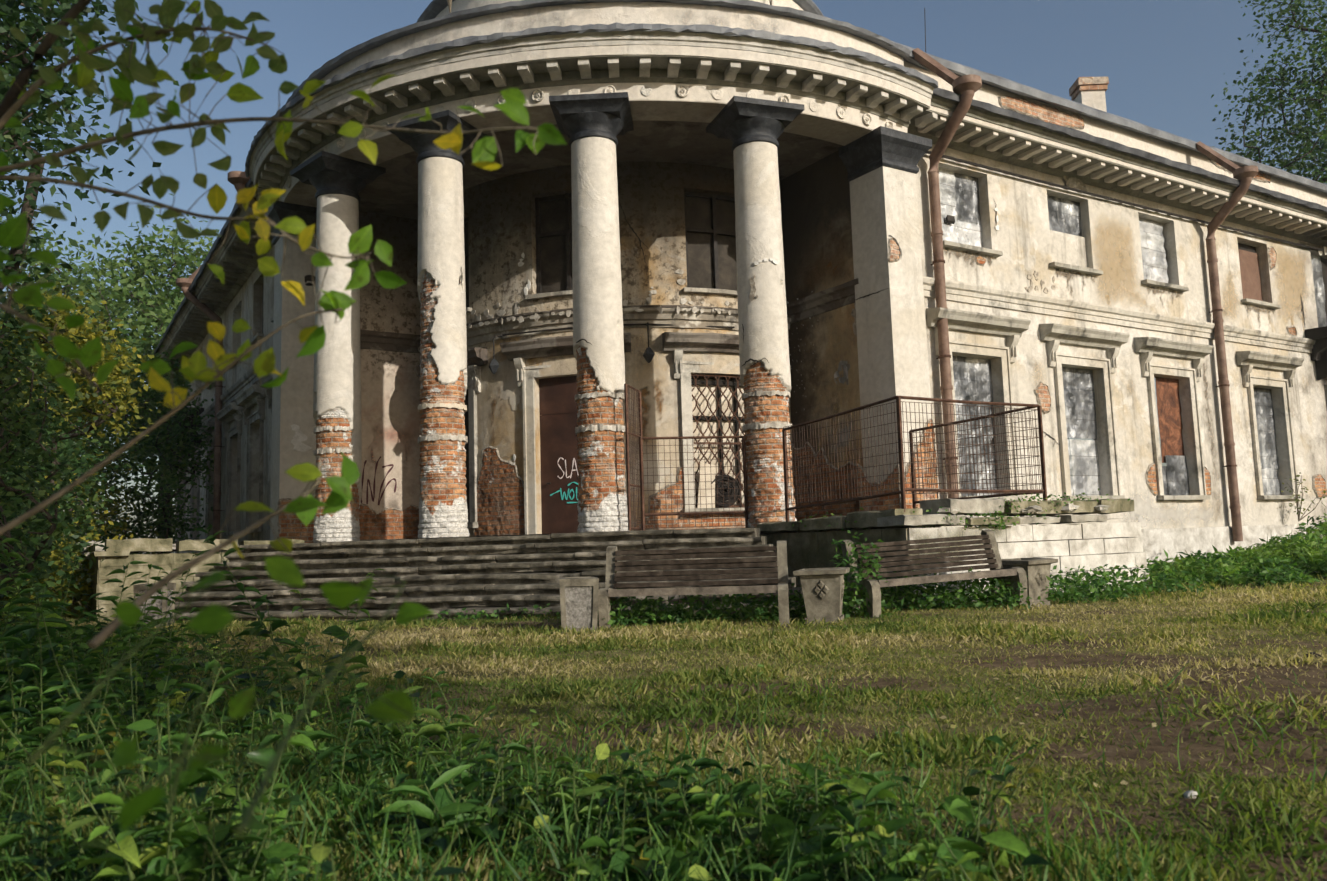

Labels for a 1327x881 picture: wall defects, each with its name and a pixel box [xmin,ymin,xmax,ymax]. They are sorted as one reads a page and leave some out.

spalling [998,96,1084,130]
spalling [277,271,525,543]
spalling [575,317,939,533]